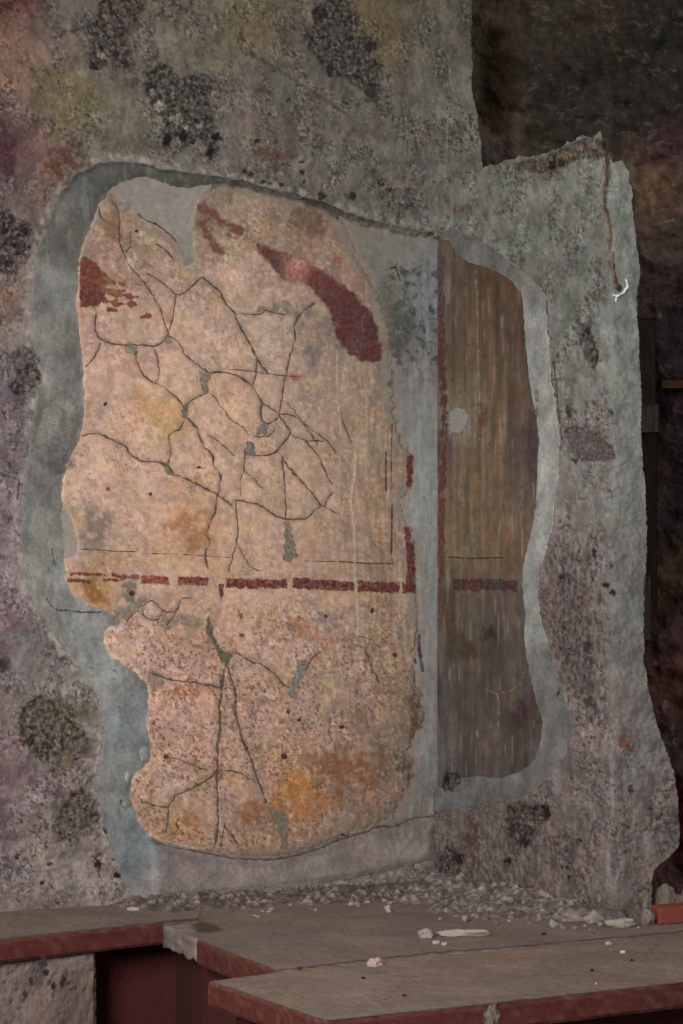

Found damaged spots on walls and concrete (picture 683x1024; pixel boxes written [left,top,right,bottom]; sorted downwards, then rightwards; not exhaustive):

spalling [513,137,611,180]
corrosion [603,138,618,288]
flaking render [576,318,601,368]
crack [81,201,352,571]
flaking render [564,405,615,465]
crack [125,597,192,626]
crack [359,636,380,684]
flaking render [550,572,596,723]
flaking render [20,695,90,762]
crack [120,652,434,861]
flaking render [52,791,107,846]
flaking render [504,804,551,848]